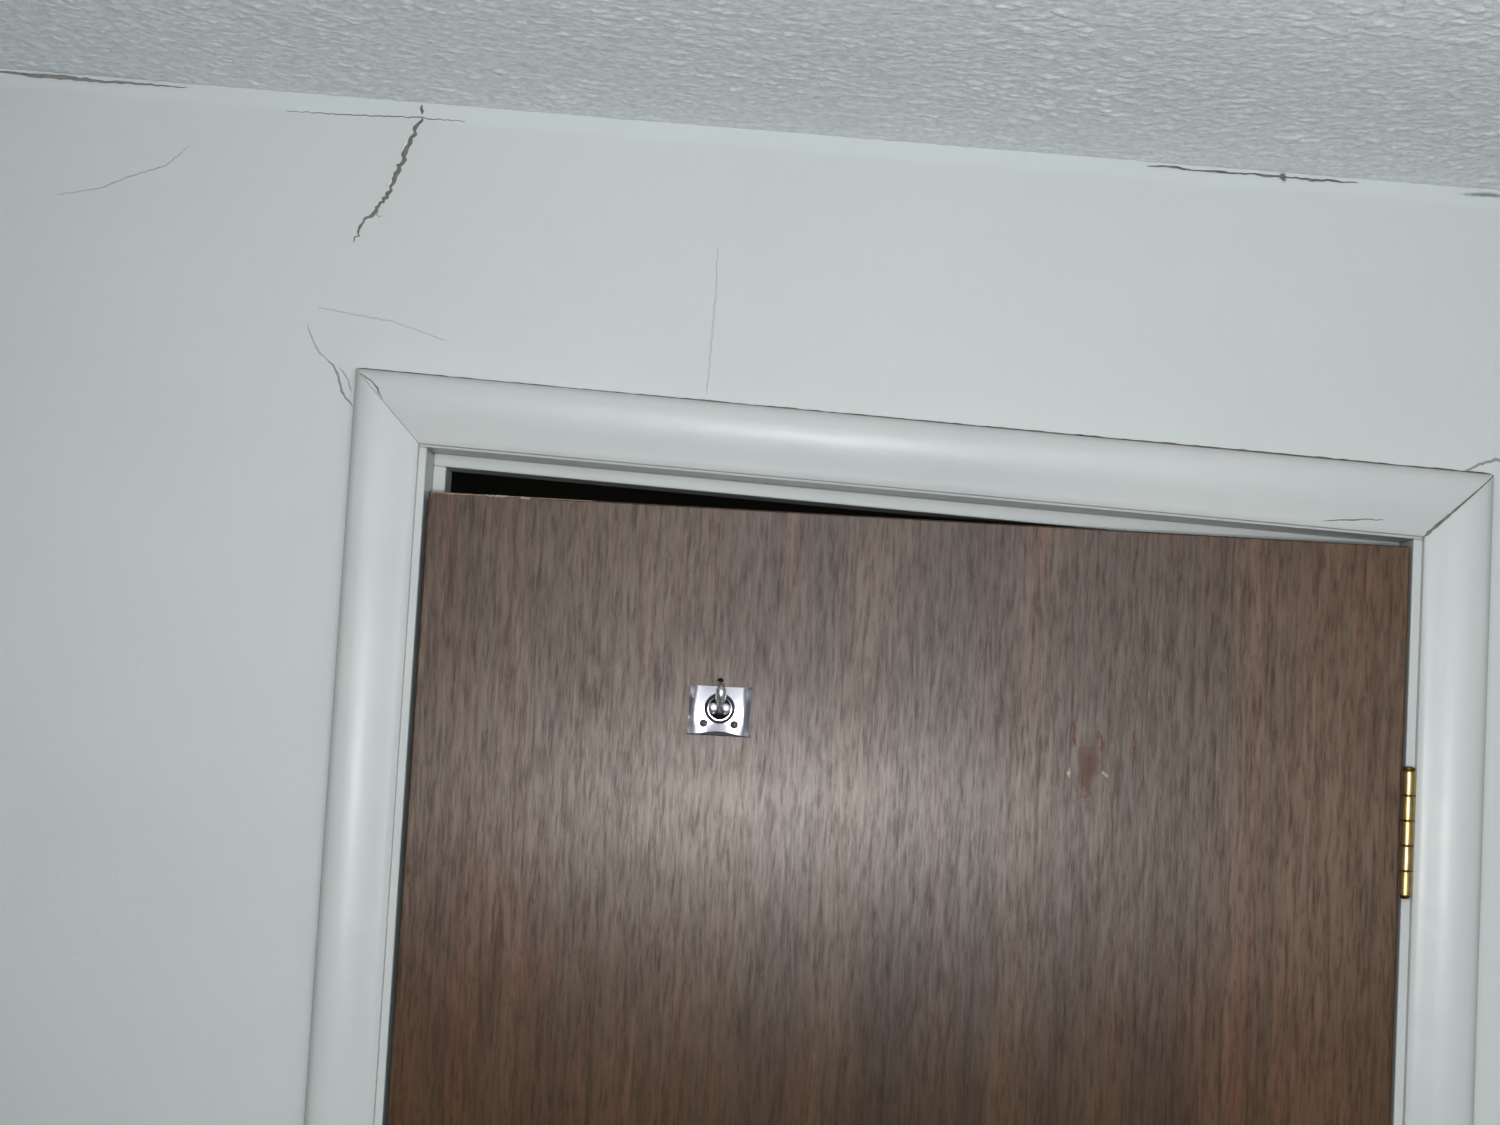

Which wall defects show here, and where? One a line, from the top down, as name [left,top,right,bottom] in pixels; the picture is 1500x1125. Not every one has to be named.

crack [289,105,465,243]